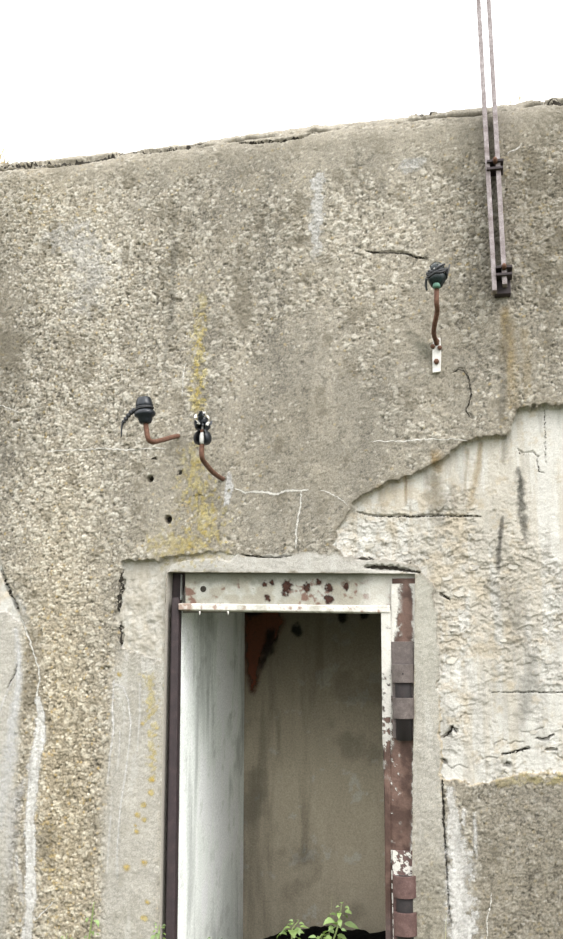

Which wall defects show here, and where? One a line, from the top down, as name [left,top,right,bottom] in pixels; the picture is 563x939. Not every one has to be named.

crack [366,251,425,259]
crack [234,488,481,558]
crack [2,574,40,701]
crack [116,572,124,645]
corrosion [245,613,285,692]
spalling [334,406,563,785]
damp [16,697,46,939]
peeling [391,823,413,939]
damp [445,787,478,939]